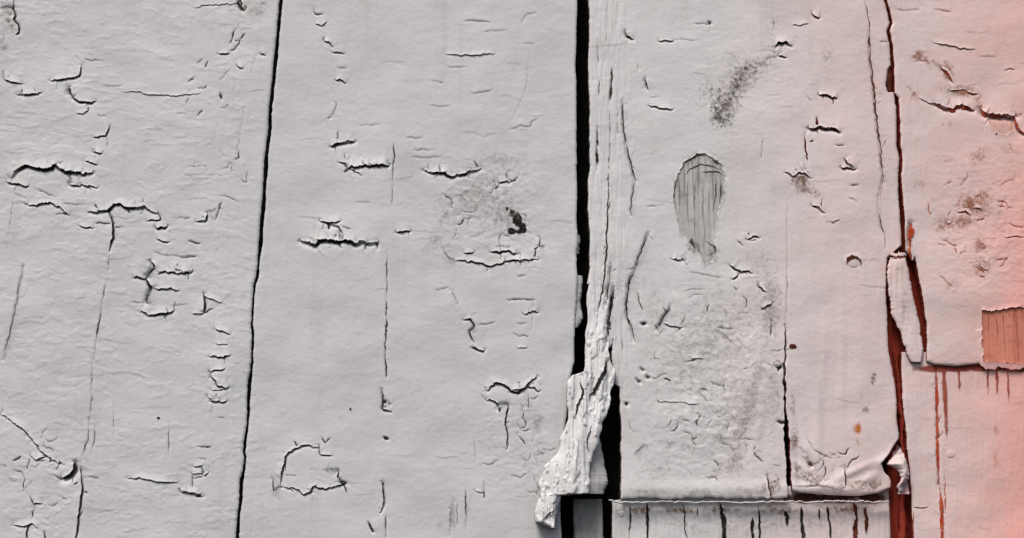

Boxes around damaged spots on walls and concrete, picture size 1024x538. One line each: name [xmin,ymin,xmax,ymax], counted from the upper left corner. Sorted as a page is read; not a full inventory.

crack [0,258,114,538]
crack [85,125,110,165]
crack [156,140,247,257]
crack [382,262,390,378]
crack [439,172,545,352]
peeling [608,289,617,348]
peeling [670,150,728,268]
crack [601,232,859,499]
crack [808,88,838,103]
peeling [919,95,1024,138]
peeling [975,302,1024,370]
crack [450,396,545,528]